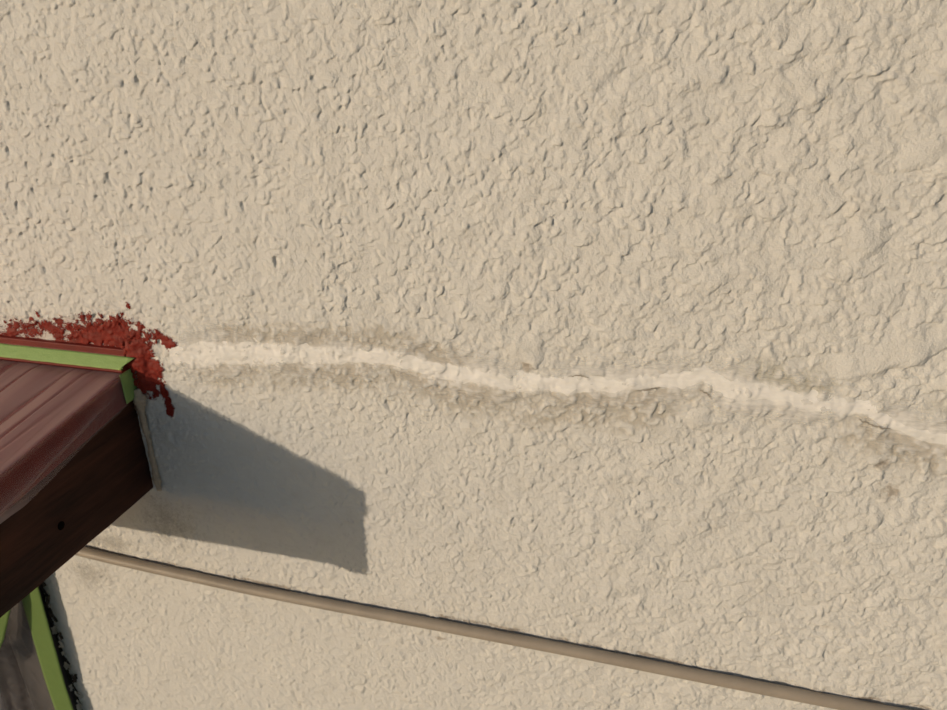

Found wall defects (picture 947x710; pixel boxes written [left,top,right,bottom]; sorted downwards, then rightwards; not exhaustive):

crack [168,330,947,459]